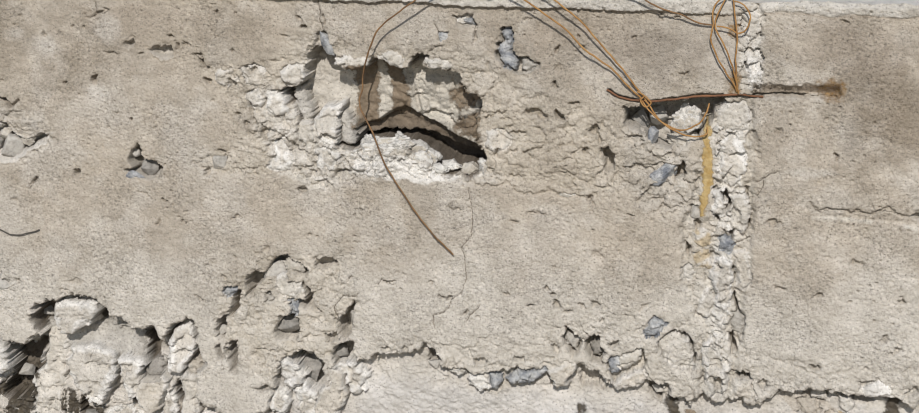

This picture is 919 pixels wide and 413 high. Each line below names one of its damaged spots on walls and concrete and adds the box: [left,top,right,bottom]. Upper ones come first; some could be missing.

crack [0,96,16,112]
spalling [215,10,513,190]
flaking render [489,21,544,84]
rust [699,115,714,217]
spalling [617,9,845,339]
crack [432,190,480,328]
spalling [0,292,221,413]
peeling [258,342,374,413]
spalling [418,310,758,408]
damp [665,394,696,413]
spalling [795,358,894,413]
damp [883,397,901,413]